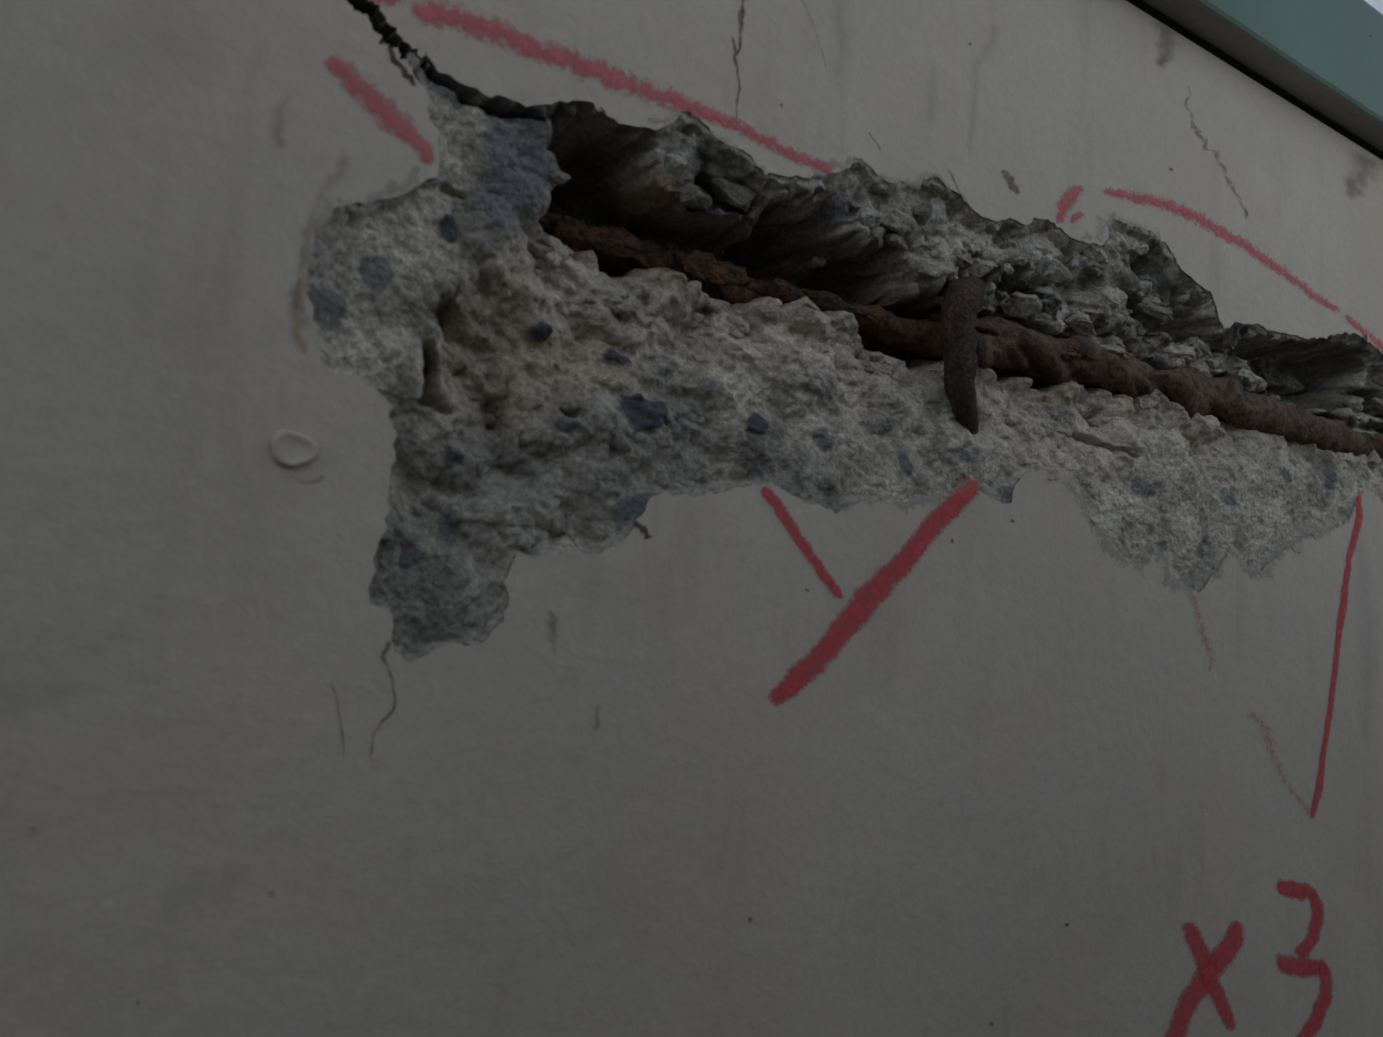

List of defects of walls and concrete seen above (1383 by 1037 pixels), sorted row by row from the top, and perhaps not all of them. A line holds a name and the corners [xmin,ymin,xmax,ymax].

crack [346,0,430,85]
crack [733,0,744,102]
spalling [295,51,1383,662]